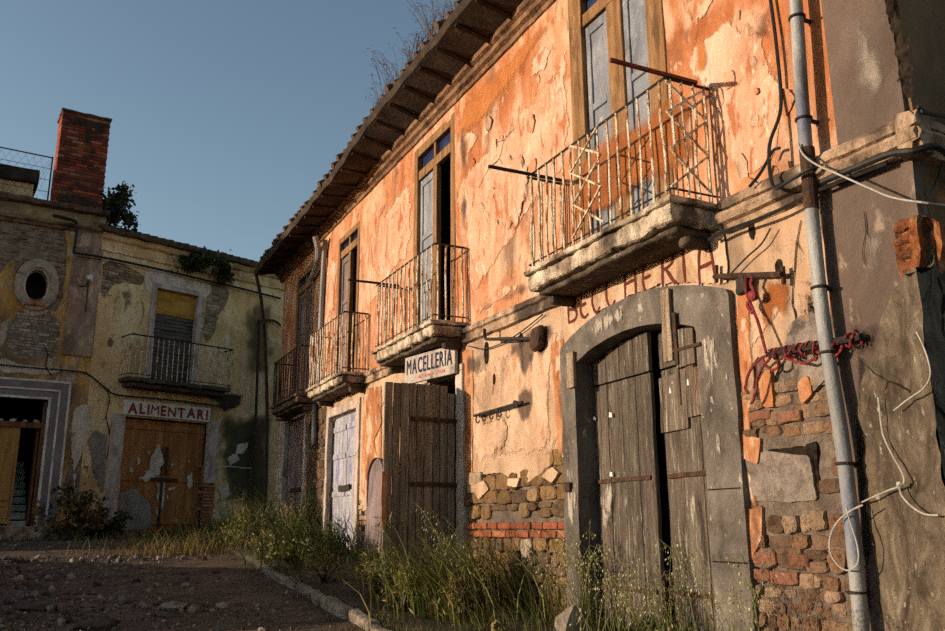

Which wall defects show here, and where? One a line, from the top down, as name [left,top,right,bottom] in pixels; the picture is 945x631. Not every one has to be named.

crack [885,0,915,99]
peeling [457,47,569,290]
flaking render [0,221,67,375]
flaking render [98,261,229,343]
peeling [749,259,789,348]
peeling [61,404,91,501]
peeling [228,442,248,465]
flaking render [463,332,576,615]
flaking render [740,306,853,631]